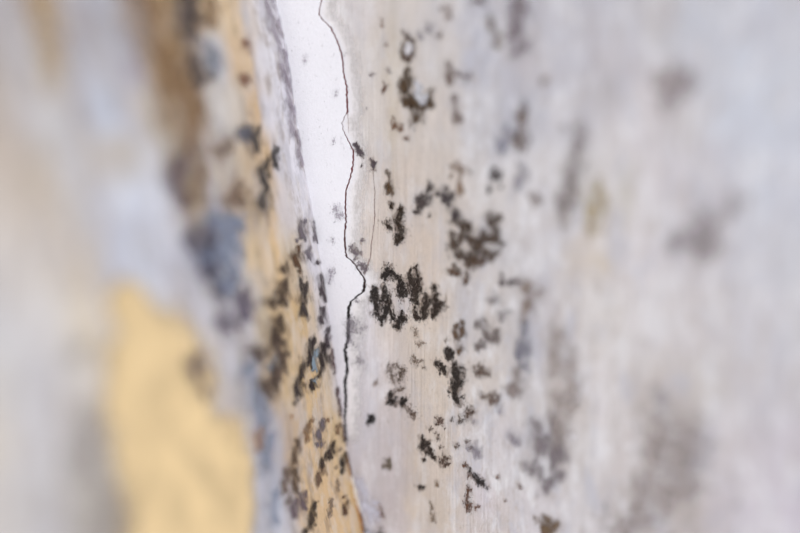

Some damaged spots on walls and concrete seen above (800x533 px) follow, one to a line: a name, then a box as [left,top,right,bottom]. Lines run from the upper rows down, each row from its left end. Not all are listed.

leakage [399,27,434,123]
leakage [352,142,377,170]
leakage [242,219,336,469]
crack [319,0,382,533]
leakage [342,316,368,347]
leakage [348,238,369,274]
leakage [355,262,448,330]
leakage [382,165,504,286]
leakage [480,271,539,413]
leakage [271,388,349,533]
leakage [375,313,503,514]
leakage [524,418,568,493]